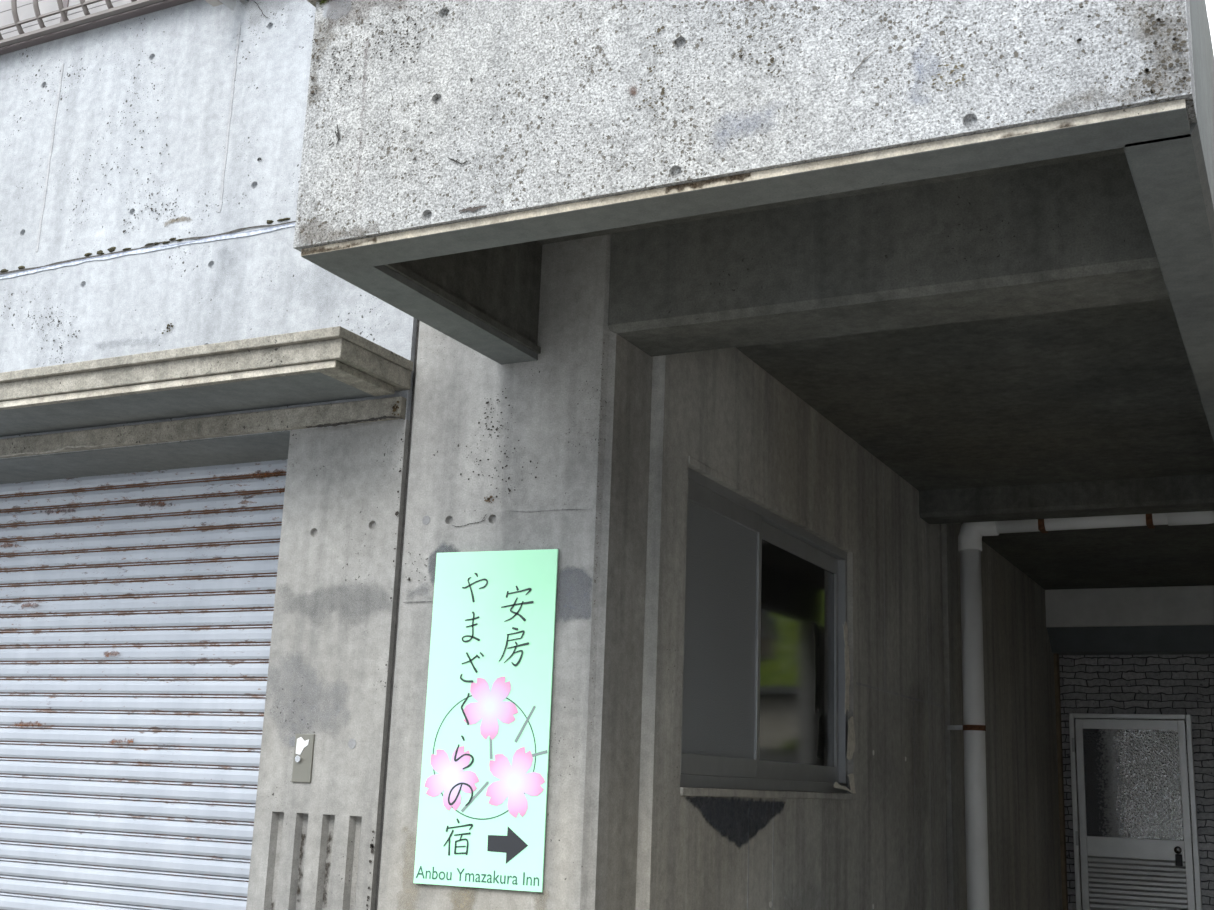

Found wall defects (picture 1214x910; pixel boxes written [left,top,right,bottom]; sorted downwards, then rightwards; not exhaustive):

crack [0,218,296,279]